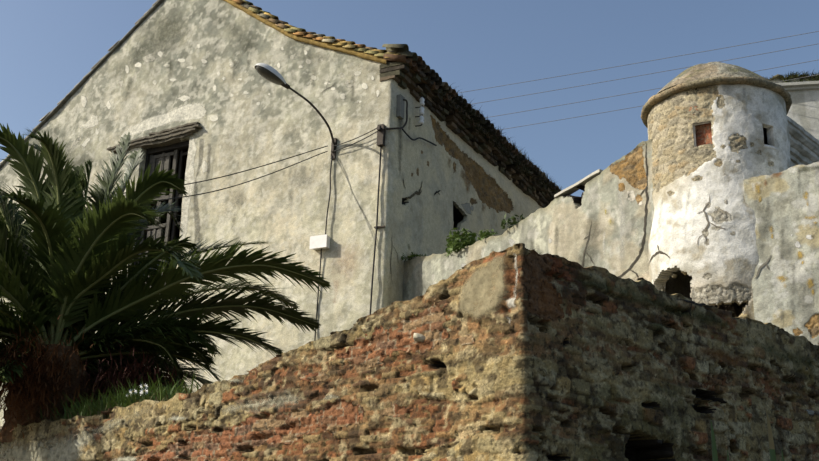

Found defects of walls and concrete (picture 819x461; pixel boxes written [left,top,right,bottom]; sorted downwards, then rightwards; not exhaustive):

flaking render [430,115,514,214]
flaking render [610,86,761,206]
crack [618,153,670,278]
crack [697,195,728,245]
crack [582,226,594,267]
crack [679,299,713,318]
flaking render [692,272,752,318]
flaking render [793,313,819,344]